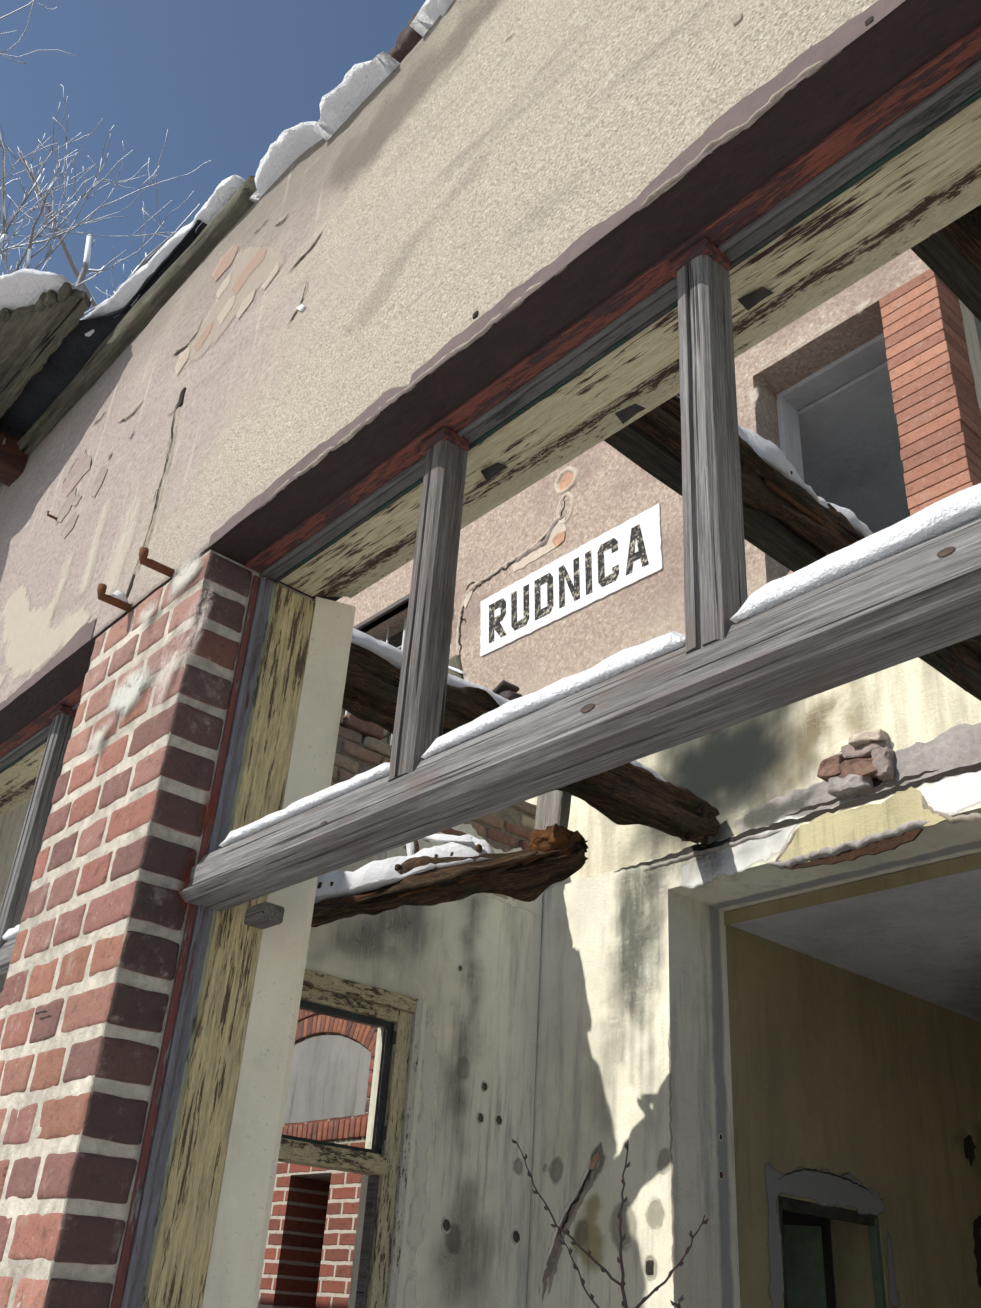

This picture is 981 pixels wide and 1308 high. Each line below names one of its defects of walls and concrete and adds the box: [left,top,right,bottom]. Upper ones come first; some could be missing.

spalling [637,50,842,212]
crack [172,316,205,356]
flaking render [175,245,284,374]
spalling [259,266,567,509]
peeling [55,453,108,539]
crack [85,387,186,597]
peeling [0,585,90,686]
crack [456,497,565,656]
crack [614,762,981,872]
flaking render [682,728,981,887]
damp [618,869,659,1010]
spalling [973,1215,981,1288]